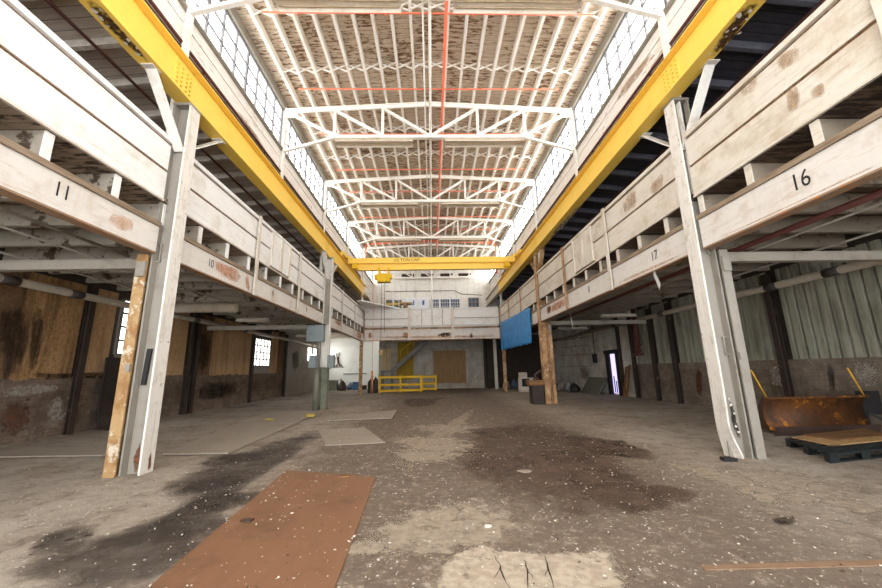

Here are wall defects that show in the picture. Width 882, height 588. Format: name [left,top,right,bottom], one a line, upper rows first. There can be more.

leakage [2,312,43,371]